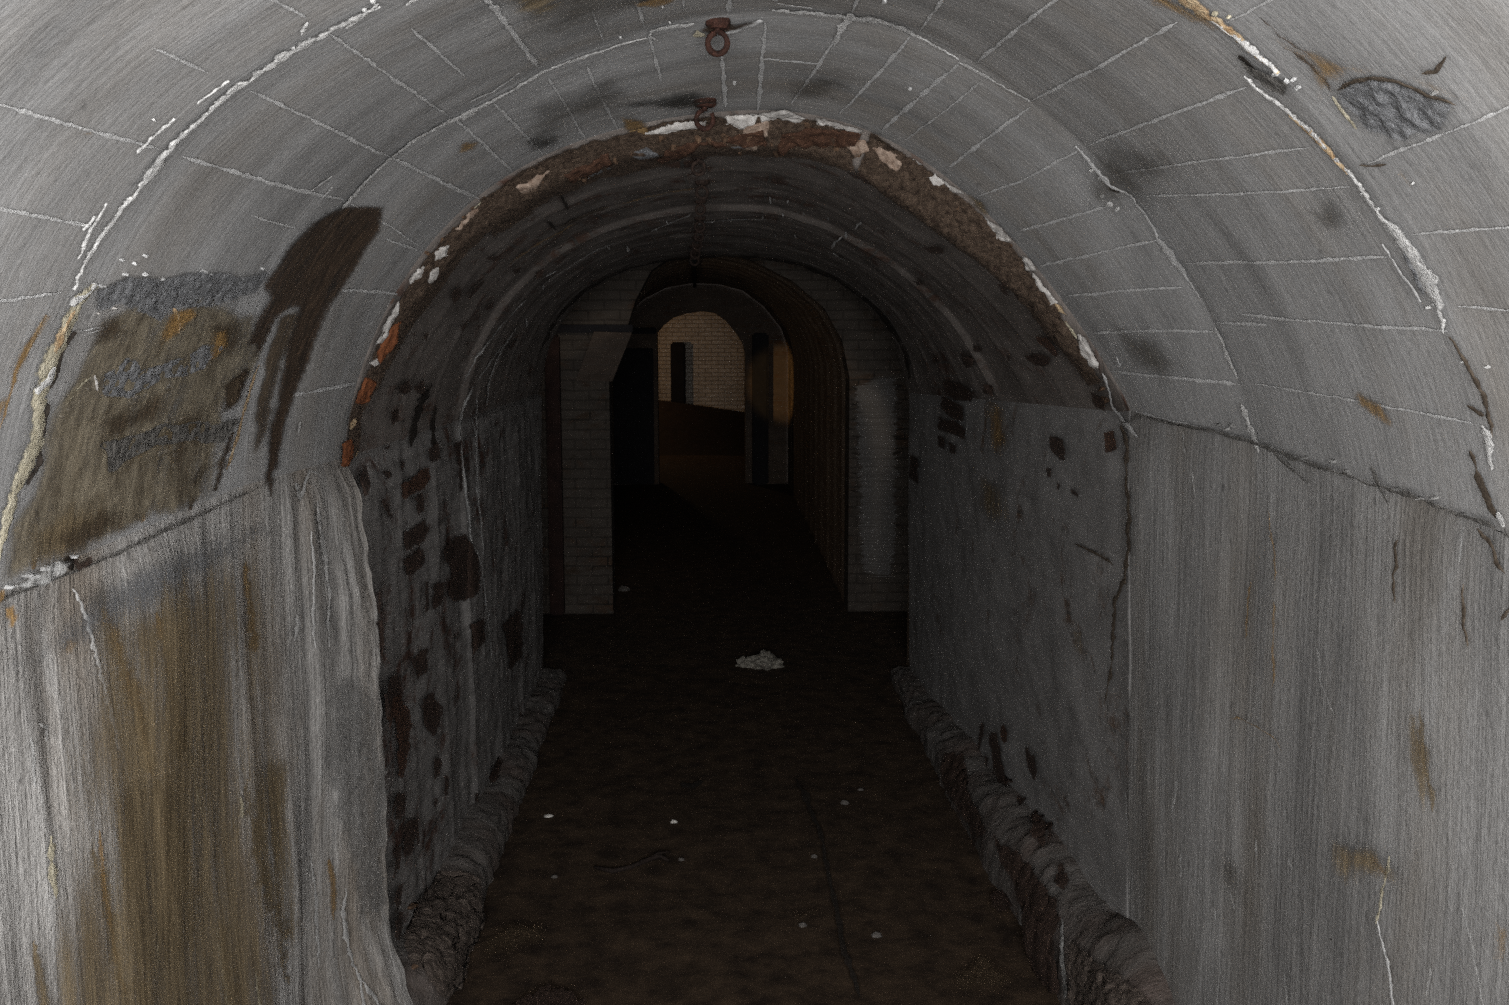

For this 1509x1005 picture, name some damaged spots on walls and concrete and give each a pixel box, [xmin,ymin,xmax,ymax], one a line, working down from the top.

leakage [31,562,294,1005]
leakage [0,0,381,559]
leakage [294,469,332,648]
leakage [310,853,381,1005]
peeling [376,592,385,657]
leakage [189,6,696,510]
leakage [459,300,526,656]
peeling [470,611,523,670]
spalling [341,110,1138,612]
crack [1074,337,1509,704]
spalling [1332,56,1456,141]